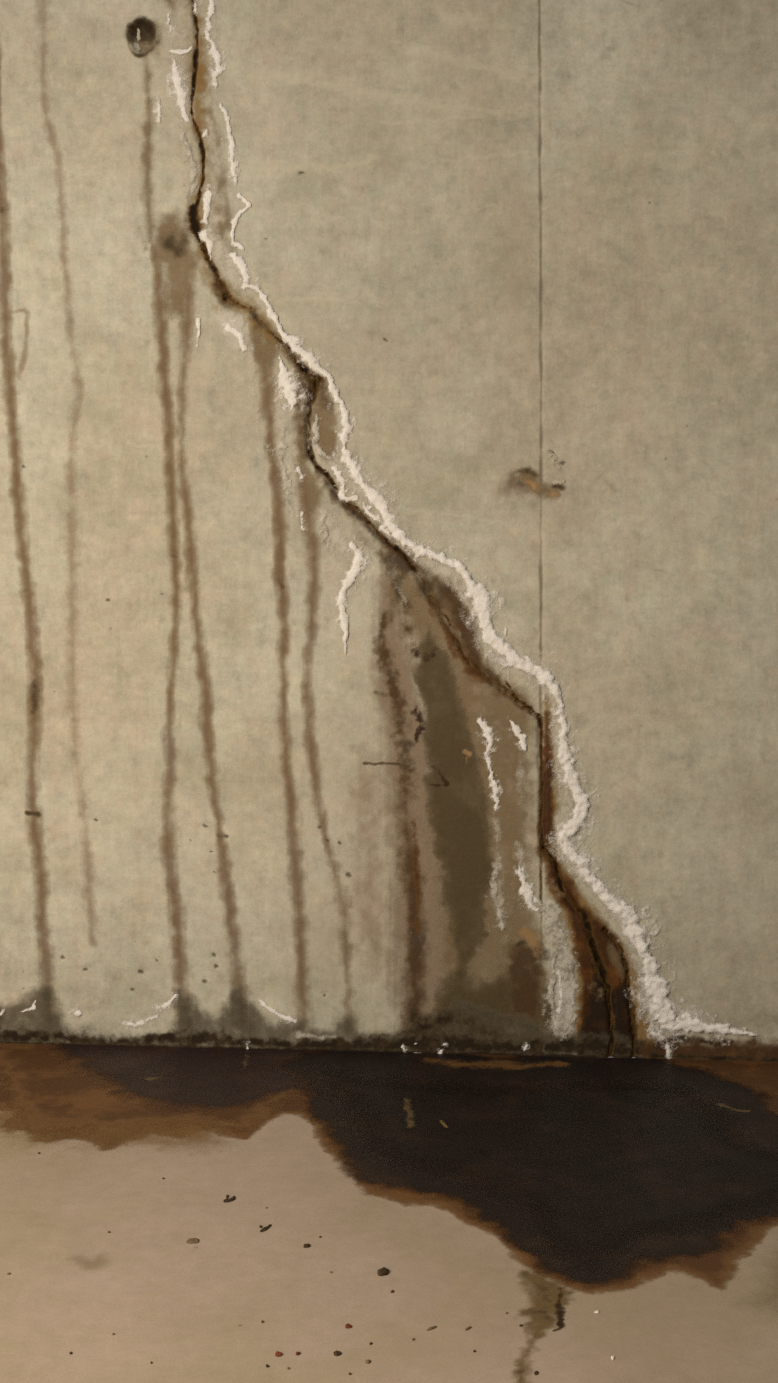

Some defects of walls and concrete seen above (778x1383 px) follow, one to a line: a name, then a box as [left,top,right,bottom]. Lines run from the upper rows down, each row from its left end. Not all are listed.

water stain [0,0,778,1062]
crack [187,0,636,1057]
water stain [515,1271,571,1383]